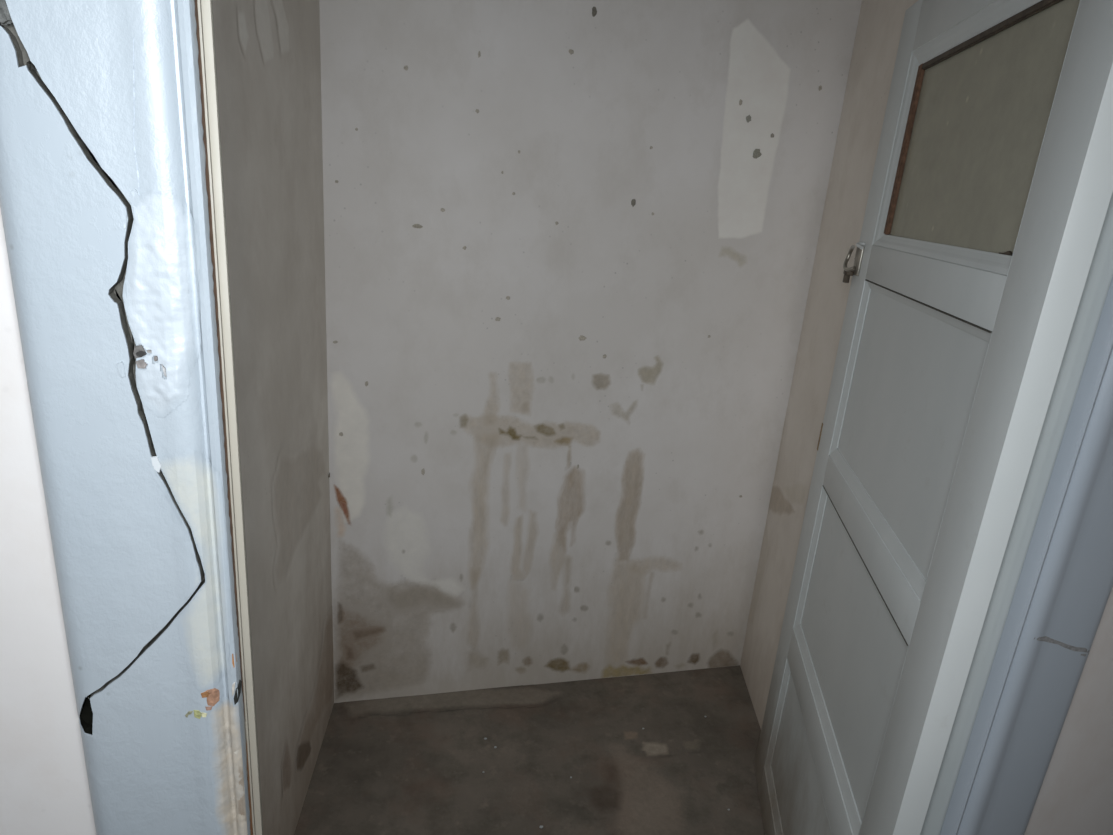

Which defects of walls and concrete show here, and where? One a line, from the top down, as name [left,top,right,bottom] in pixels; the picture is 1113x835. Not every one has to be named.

crack [26,37,205,699]
peeling [133,345,167,377]
rust [331,483,355,541]
damp [299,353,703,741]
crack [1034,636,1089,656]